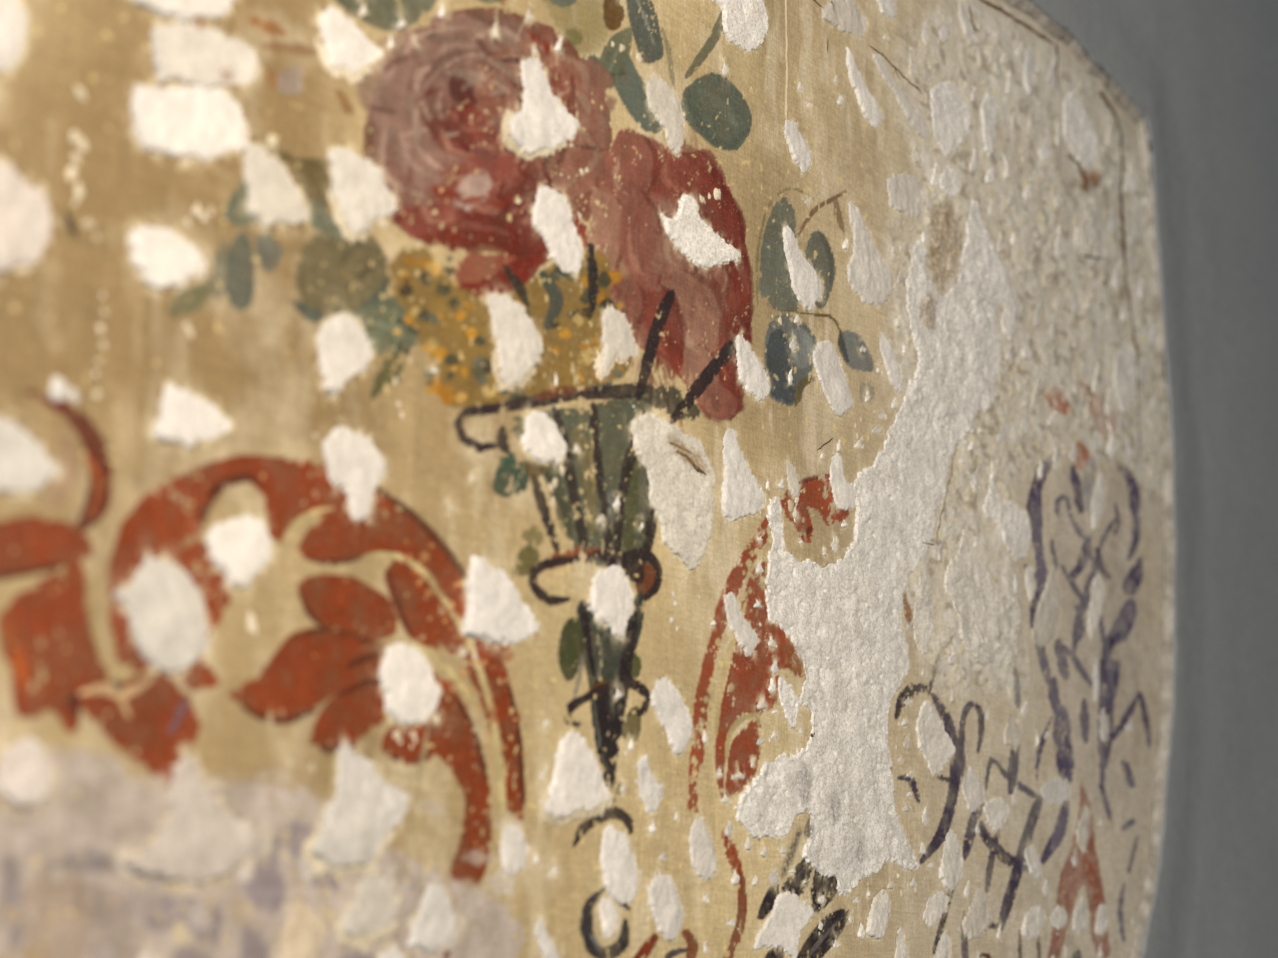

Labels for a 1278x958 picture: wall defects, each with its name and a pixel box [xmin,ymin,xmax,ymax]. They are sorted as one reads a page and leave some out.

spalling [130,0,309,229]
spalling [501,46,580,161]
spalling [0,161,52,274]
spalling [0,417,60,494]
spalling [322,425,386,522]
peeling [631,0,1175,958]
spalling [113,554,210,677]
spalling [206,514,272,589]
spalling [460,554,540,659]
spalling [379,642,440,726]
spalling [281,744,457,958]
spalling [539,731,684,941]